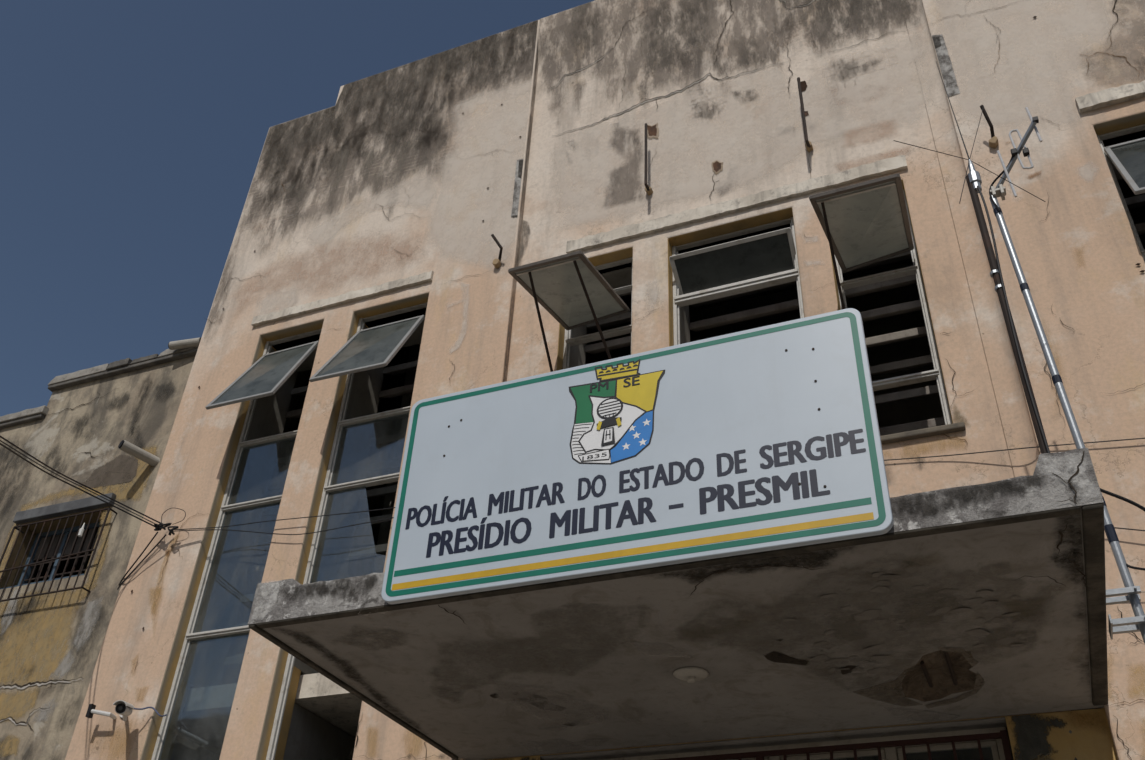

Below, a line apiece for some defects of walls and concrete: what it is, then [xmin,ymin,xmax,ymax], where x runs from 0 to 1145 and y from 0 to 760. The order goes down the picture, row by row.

crack [547,0,1019,136]
crack [1081,0,1139,76]
water stain [242,0,914,267]
water stain [503,298,514,382]
water stain [110,385,173,421]
crack [1004,362,1086,587]
water stain [0,589,34,636]
water stain [54,601,103,677]
crack [0,677,84,730]
spalling [854,647,985,708]